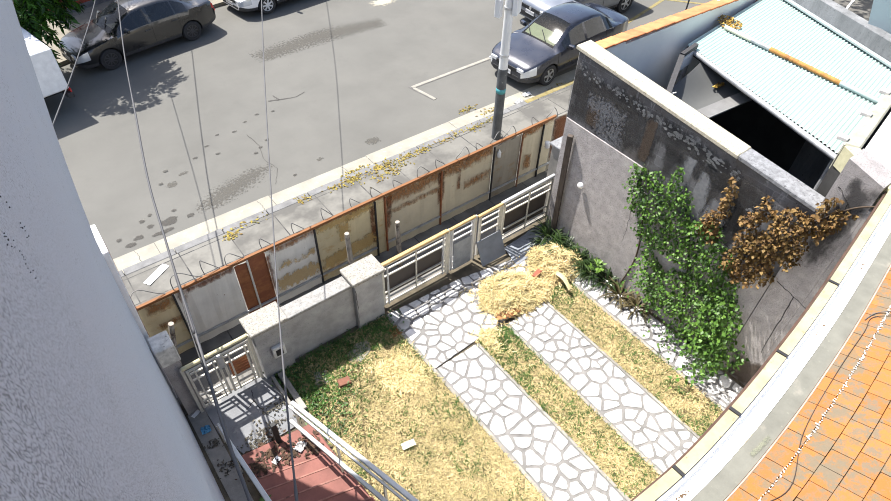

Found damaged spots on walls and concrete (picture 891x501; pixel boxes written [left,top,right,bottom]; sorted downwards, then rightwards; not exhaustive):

corrosion [386,147,494,227]
corrosion [549,115,567,157]
damp [570,69,773,264]
corrosion [265,203,377,290]